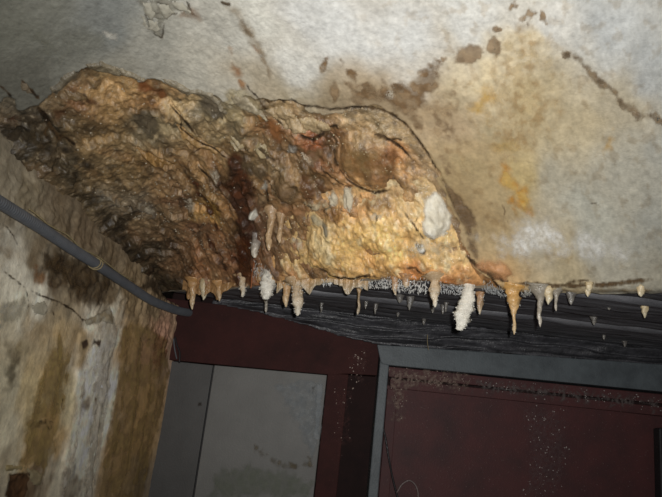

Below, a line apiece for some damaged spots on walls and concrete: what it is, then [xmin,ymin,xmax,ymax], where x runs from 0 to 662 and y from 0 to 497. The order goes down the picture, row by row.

peeling [140,0,191,36]
damp [457,27,502,63]
damp [355,57,446,115]
damp [584,66,641,120]
crack [247,86,436,194]
damp [46,254,110,305]
damp [97,210,181,304]
damp [185,177,219,215]
spalling [0,61,501,302]
damp [225,154,485,286]
efflorescence [512,223,562,253]
damp [82,321,116,497]